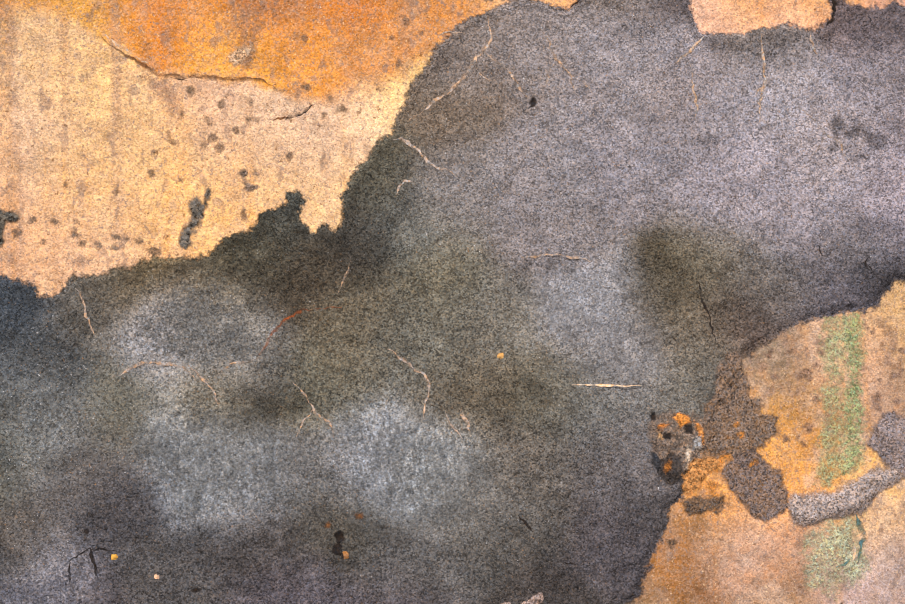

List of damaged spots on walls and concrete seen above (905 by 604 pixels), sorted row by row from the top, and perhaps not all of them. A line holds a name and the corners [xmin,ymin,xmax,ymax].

crack [105,35,270,85]
leakage [708,0,905,61]
crack [270,105,312,121]
leakage [831,119,882,148]
leakage [621,237,905,380]
leakage [0,136,668,604]